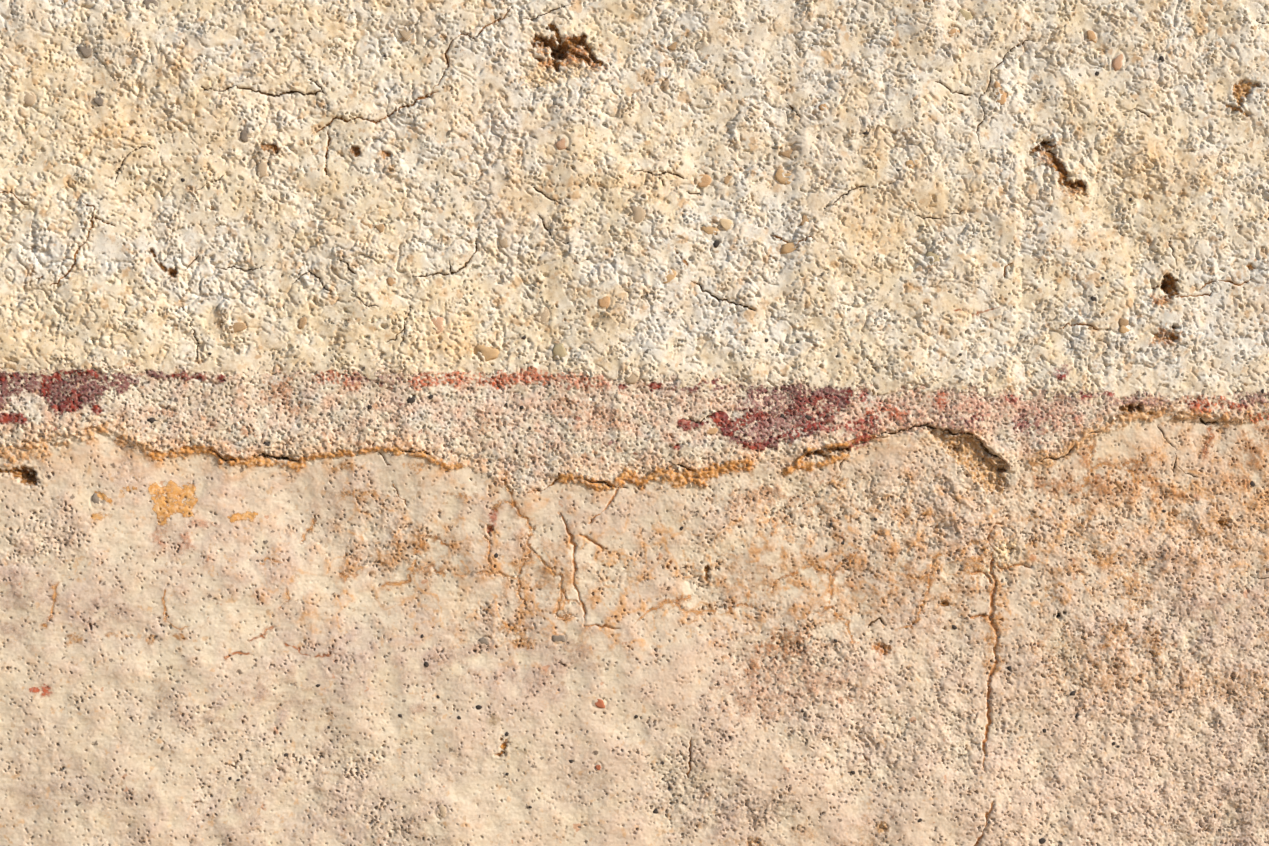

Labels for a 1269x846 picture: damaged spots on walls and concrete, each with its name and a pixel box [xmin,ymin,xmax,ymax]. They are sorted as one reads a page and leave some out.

crack [201,5,568,175]
spalling [520,35,609,87]
crack [935,40,1028,151]
spalling [1030,140,1089,197]
crack [24,200,115,286]
crack [414,241,478,277]
crack [294,259,411,345]
crack [691,281,755,311]
crack [210,449,298,461]
crack [838,424,1007,480]
crack [1038,415,1217,487]
crack [339,472,1030,778]